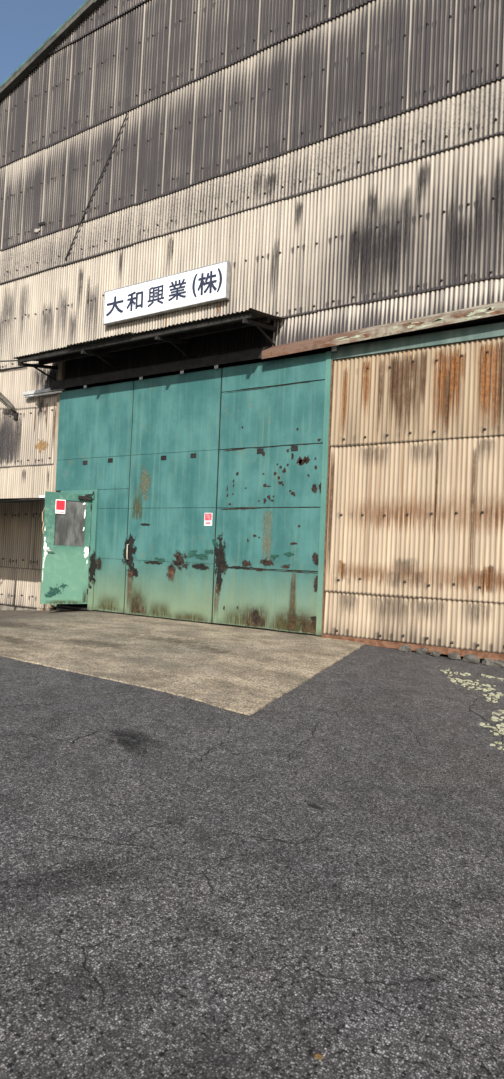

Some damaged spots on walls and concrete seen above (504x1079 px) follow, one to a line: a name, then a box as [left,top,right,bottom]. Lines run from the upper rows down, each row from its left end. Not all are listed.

damp [350,163,429,275]
damp [448,178,504,259]
damp [43,302,76,334]
damp [77,273,96,323]
corrosion [362,350,466,427]
corrosion [480,343,504,420]
damp [0,423,21,462]
corrosion [311,454,345,591]
corrosion [470,454,493,592]
corrosion [228,513,316,633]